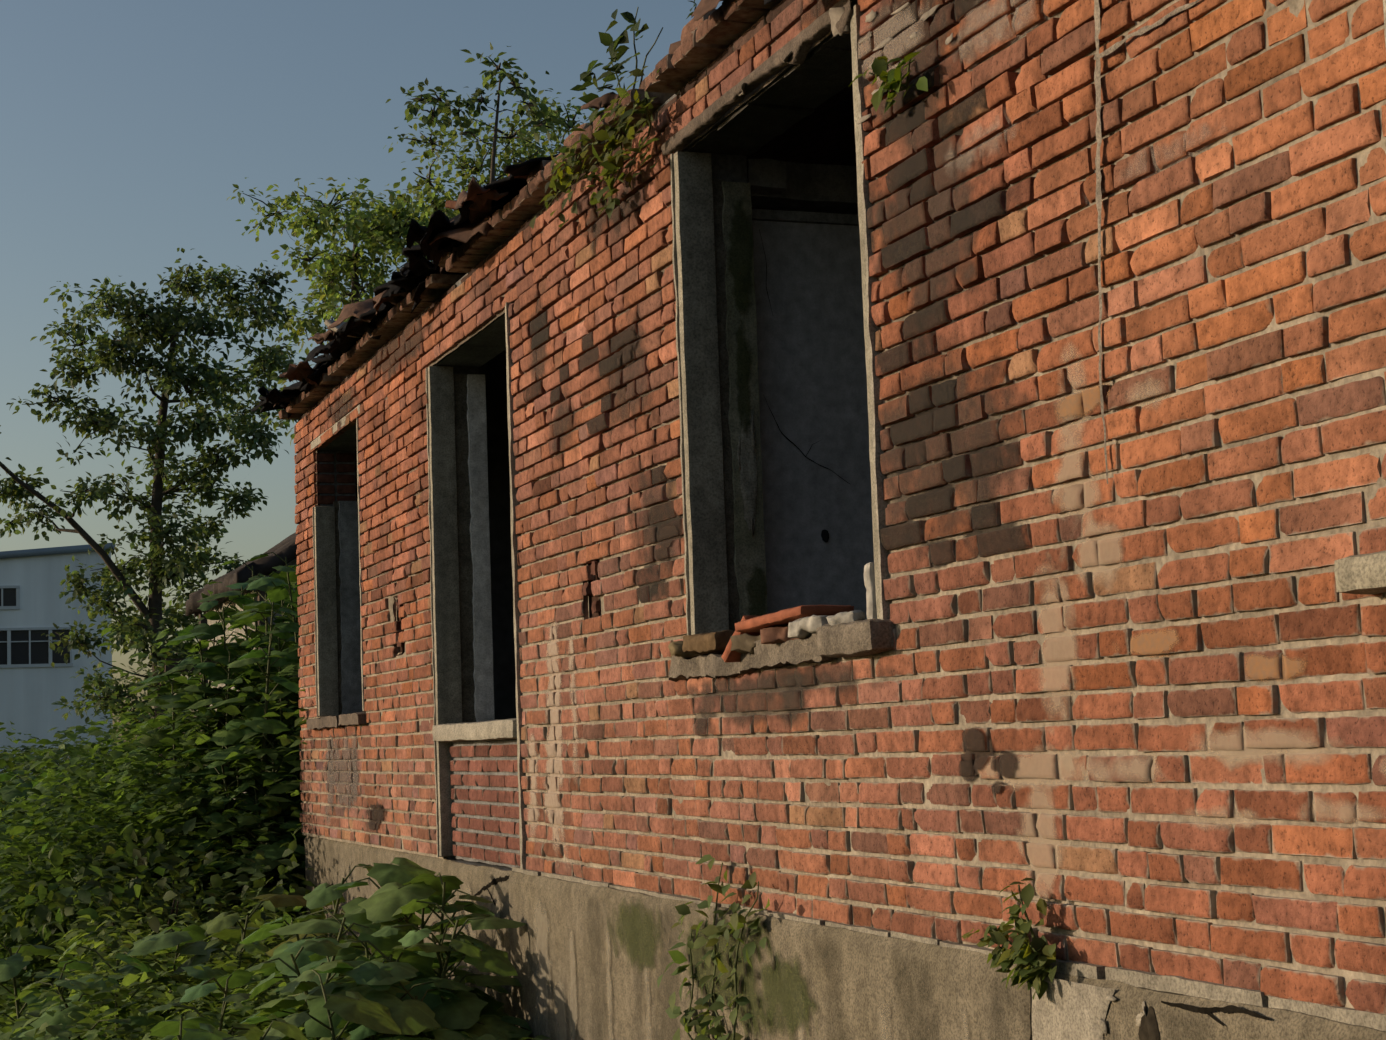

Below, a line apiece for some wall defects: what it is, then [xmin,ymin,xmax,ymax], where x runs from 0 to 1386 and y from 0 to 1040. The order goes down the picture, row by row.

crack [1094,0,1200,484]
flaking render [1031,976,1117,1040]
spalling [1136,1001,1160,1040]
crack [1161,1001,1269,1026]